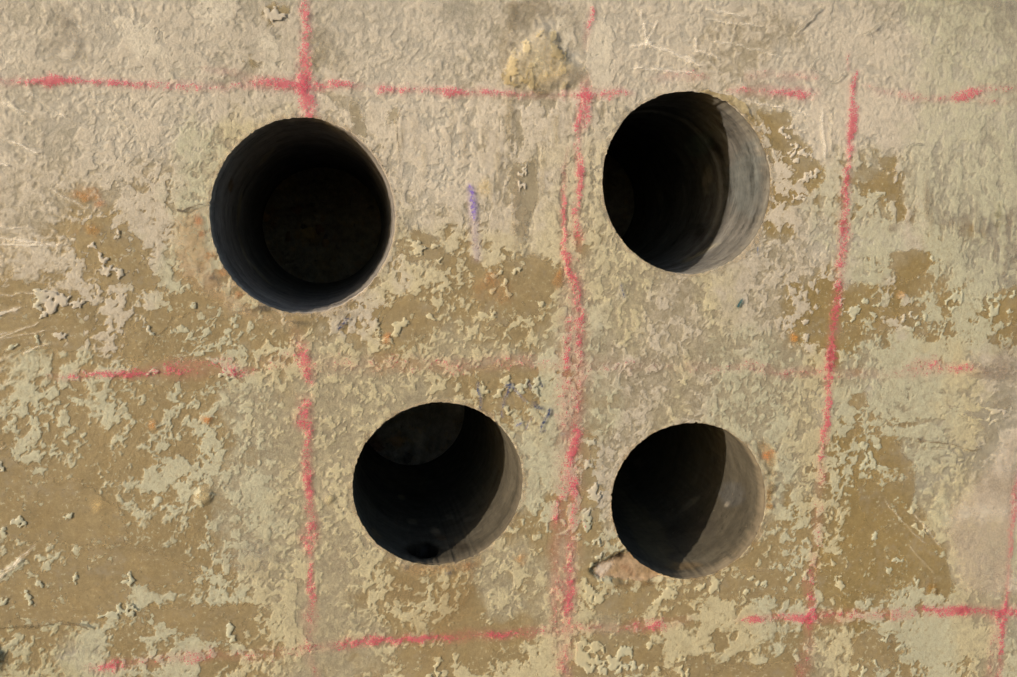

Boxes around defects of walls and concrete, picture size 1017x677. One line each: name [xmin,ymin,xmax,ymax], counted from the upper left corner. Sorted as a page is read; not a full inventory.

peeling [601,88,826,277]
peeling [858,156,901,203]
peeling [887,248,936,283]
peeling [0,272,97,356]
peeling [793,278,974,350]
peeling [980,285,1017,325]
peeling [849,392,870,412]
peeling [949,395,1011,470]
peeling [349,364,541,577]
peeling [0,439,272,653]
peeling [570,422,956,677]
peeling [391,641,459,677]